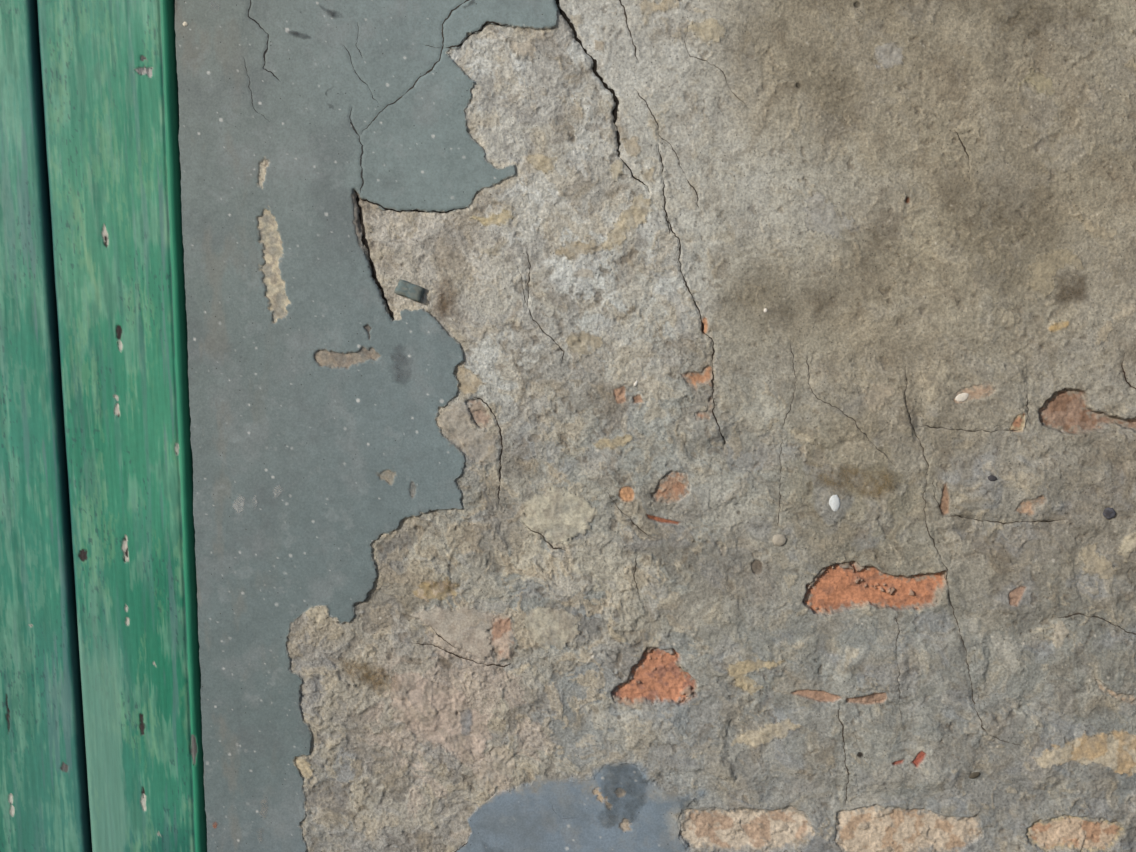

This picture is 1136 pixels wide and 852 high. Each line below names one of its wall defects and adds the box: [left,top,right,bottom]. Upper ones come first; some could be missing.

crack [244,0,279,119]
crack [684,26,749,109]
crack [344,0,508,320]
peeling [257,210,290,322]
crack [555,0,725,448]
peeling [287,13,719,852]
flaking render [1038,389,1136,434]
flaking render [803,561,946,616]